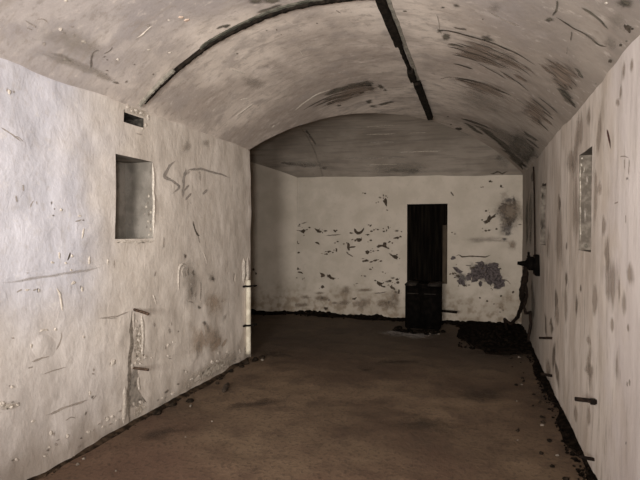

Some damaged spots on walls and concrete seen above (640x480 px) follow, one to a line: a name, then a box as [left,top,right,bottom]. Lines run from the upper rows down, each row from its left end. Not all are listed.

leakage [304,81,386,110]
leakage [449,42,532,91]
leakage [542,59,583,108]
leakage [447,116,539,170]
peeling [297,222,402,277]
peeling [449,255,509,297]
leakage [499,197,532,247]
leakage [557,197,567,259]
leakage [605,242,625,307]
spalling [79,312,153,447]